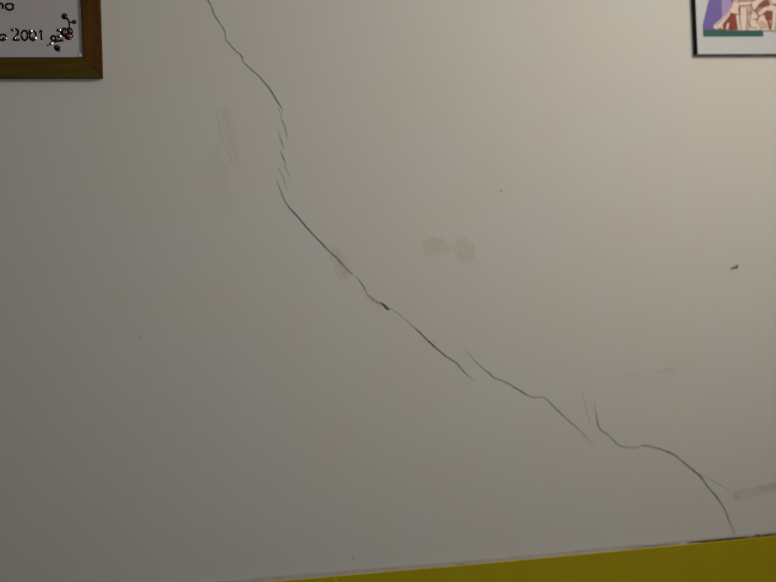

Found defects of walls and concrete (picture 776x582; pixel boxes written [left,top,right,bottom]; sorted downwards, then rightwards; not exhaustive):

crack [208,0,776,550]